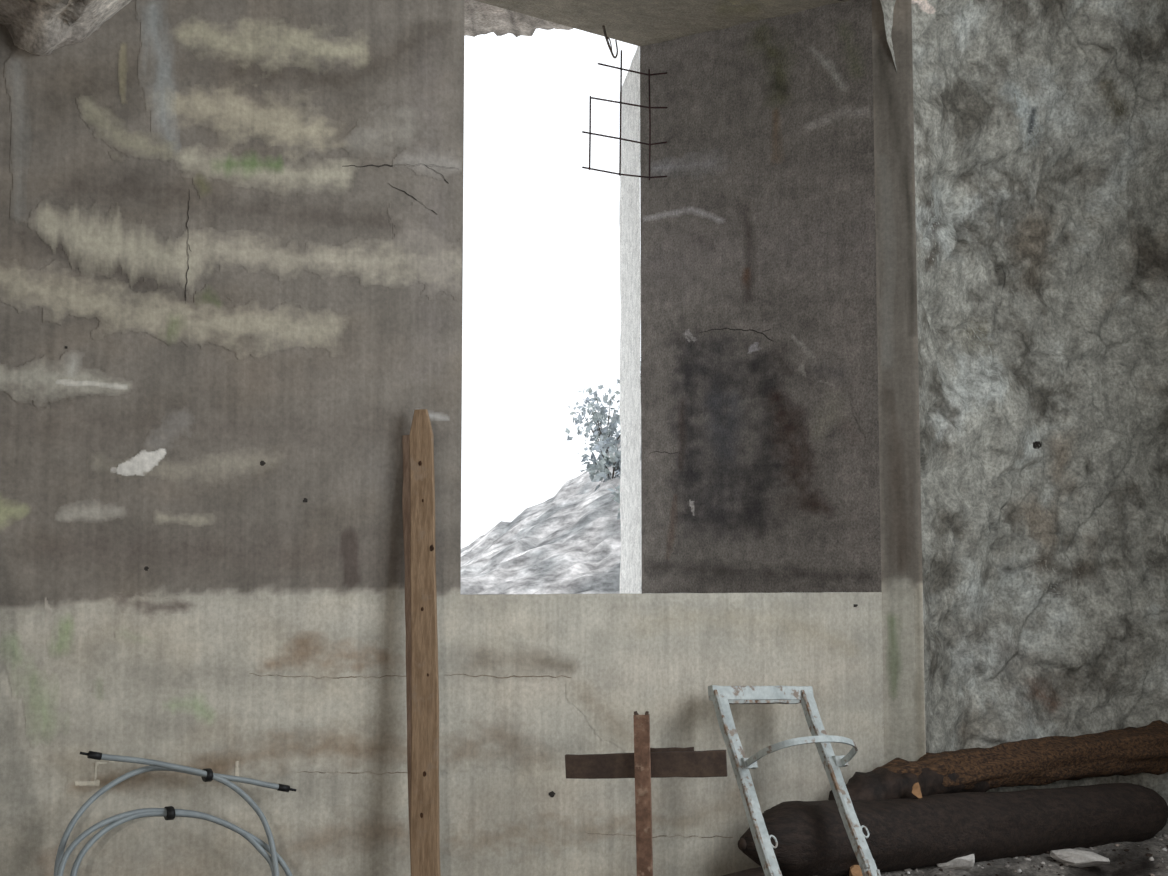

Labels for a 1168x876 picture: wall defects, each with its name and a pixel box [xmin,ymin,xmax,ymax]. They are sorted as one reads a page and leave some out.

water stain [76,0,462,197]
spalling [582,50,667,180]
water stain [0,53,462,359]
crack [342,164,458,214]
water stain [643,197,760,307]
water stain [740,18,947,378]
water stain [0,350,133,409]
water stain [54,497,128,524]
spalling [110,448,166,476]
water stain [153,509,217,527]
water stain [87,406,285,487]
water stain [629,386,925,761]